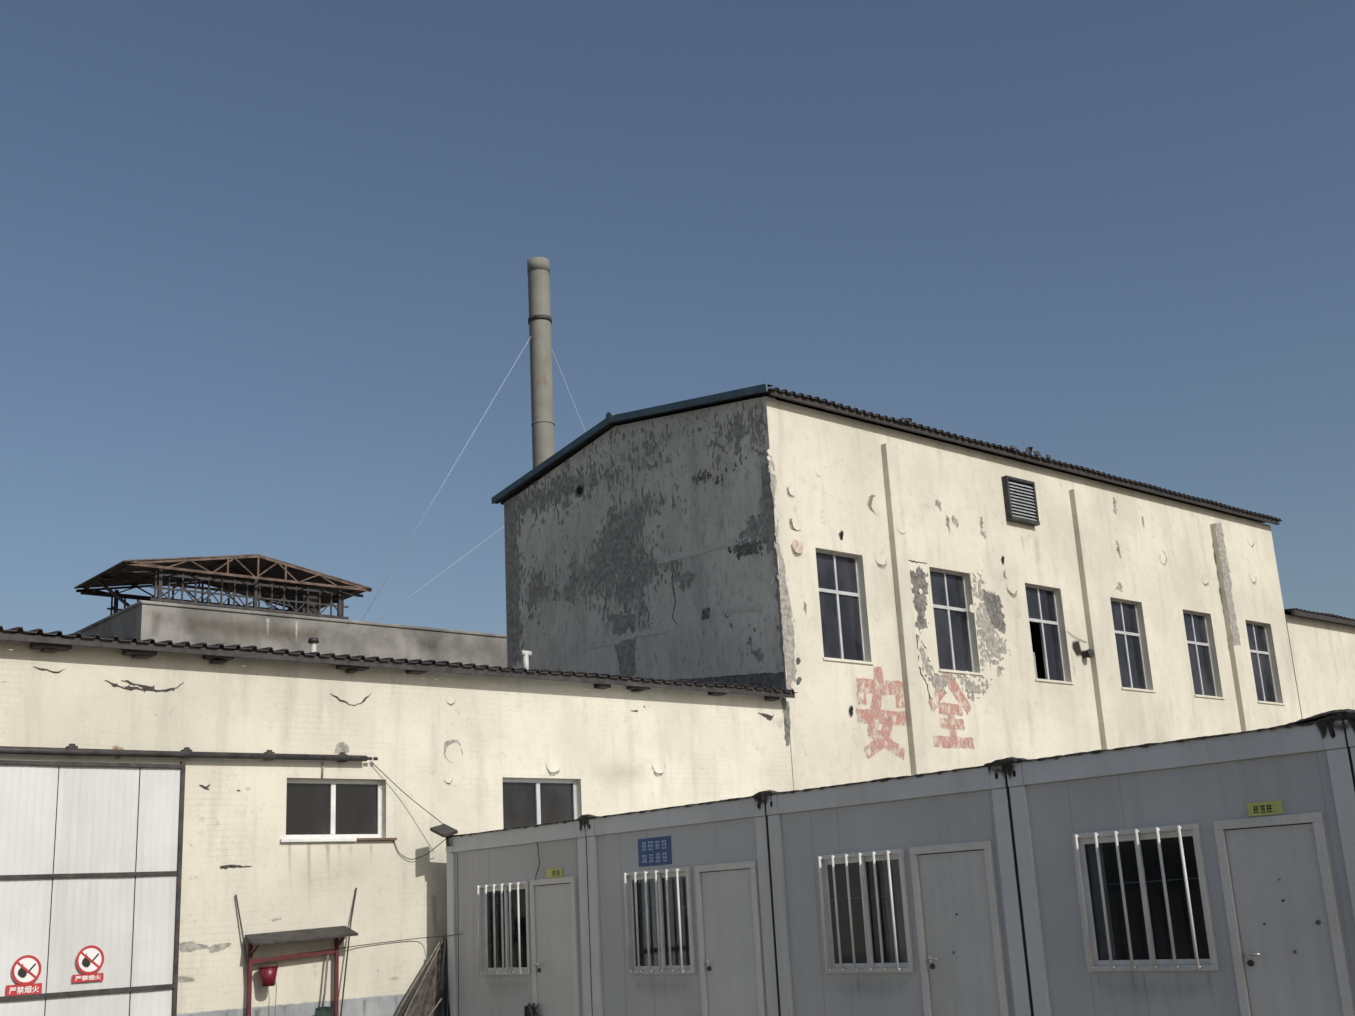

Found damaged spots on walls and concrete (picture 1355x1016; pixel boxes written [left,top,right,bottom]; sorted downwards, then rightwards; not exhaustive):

crack [104,680,184,692]
crack [332,694,370,706]
peeling [504,401,807,746]
peeling [910,556,1017,701]
peeling [1202,522,1241,646]